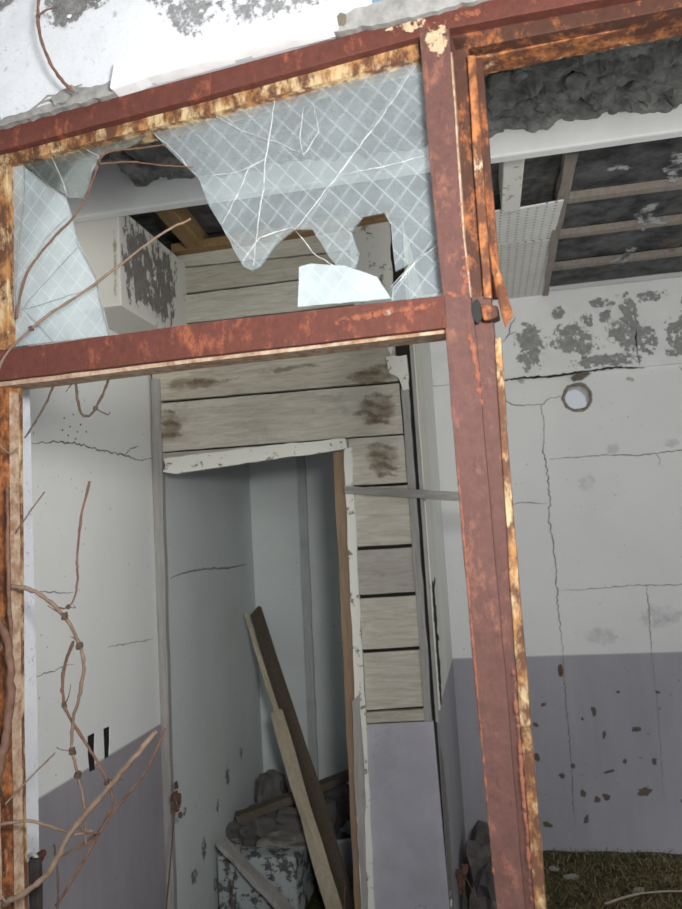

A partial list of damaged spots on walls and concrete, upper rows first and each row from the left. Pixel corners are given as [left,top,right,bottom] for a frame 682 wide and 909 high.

peeling [43,0,105,28]
peeling [147,0,319,37]
spalling [484,35,682,139]
spalling [109,74,428,187]
rust [448,246,470,297]
rust [335,304,428,324]
rust [468,334,483,404]
peeling [513,289,682,373]
crack [33,440,152,461]
crack [505,308,682,826]
rust [457,469,485,762]
rust [514,694,532,869]